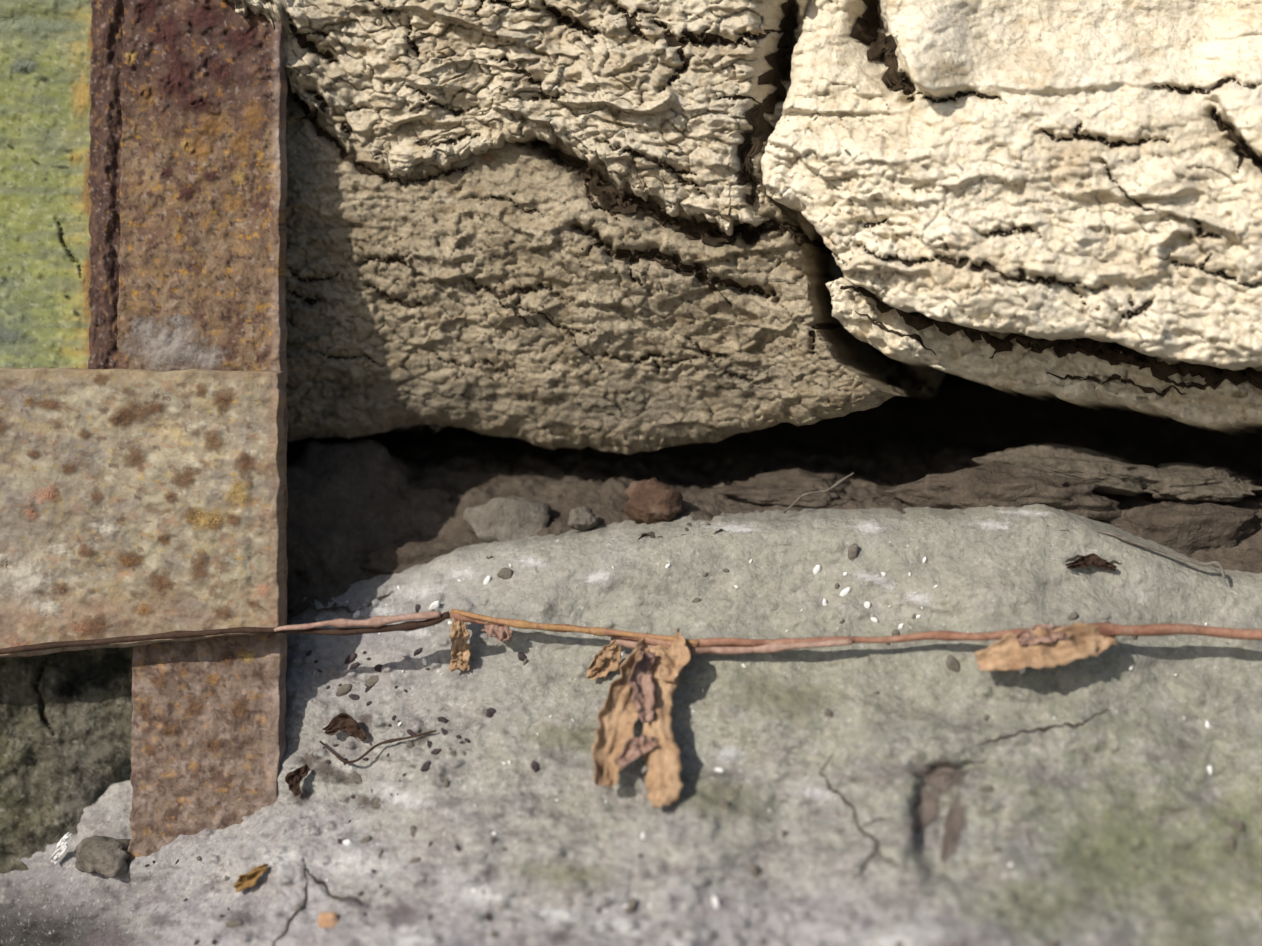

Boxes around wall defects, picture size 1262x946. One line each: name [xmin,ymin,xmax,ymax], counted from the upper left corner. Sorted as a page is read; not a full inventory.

corrosion [87,0,223,385]
corrosion [26,398,58,409]
corrosion [109,402,163,425]
corrosion [196,385,231,410]
corrosion [205,432,222,452]
corrosion [126,447,144,469]
corrosion [165,470,192,502]
corrosion [186,454,253,528]
corrosion [190,556,205,580]
corrosion [75,615,108,636]
crack [977,709,1110,746]
crack [819,752,898,880]